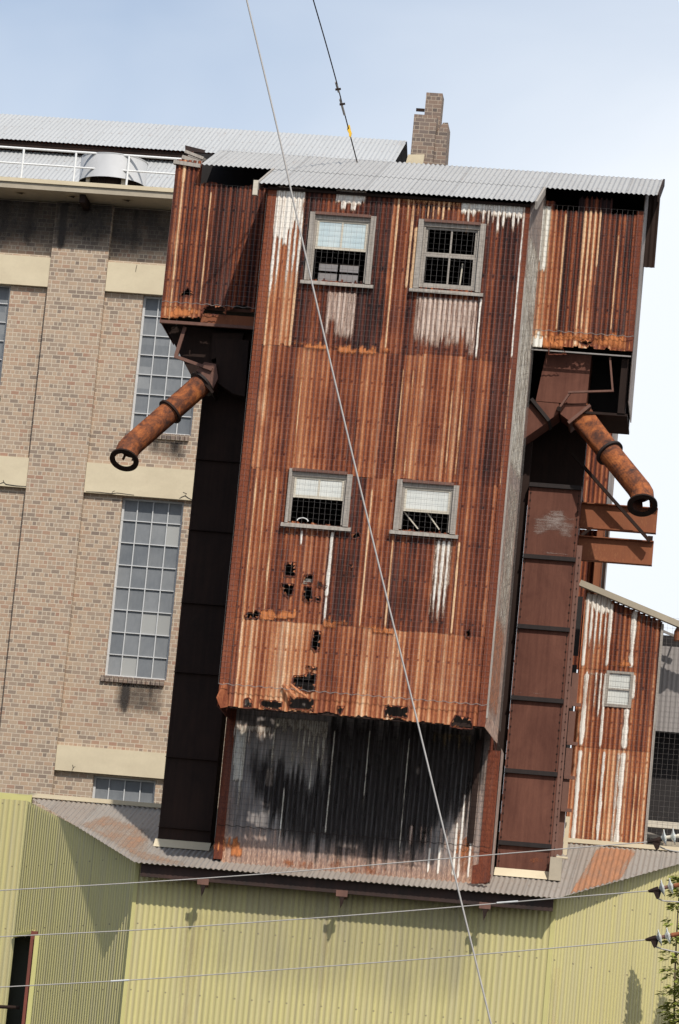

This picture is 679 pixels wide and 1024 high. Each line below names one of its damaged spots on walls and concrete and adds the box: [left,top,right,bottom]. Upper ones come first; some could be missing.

rust [166,166,212,318]
rust [288,198,418,355]
rust [542,210,630,350]
rust [393,369,414,474]
rust [445,390,463,473]
rust [242,477,296,621]
rust [359,490,394,634]
rust [450,542,460,634]
damp [120,683,153,710]
peeling [233,666,328,803]
damp [268,731,472,877]
rust [571,751,641,893]